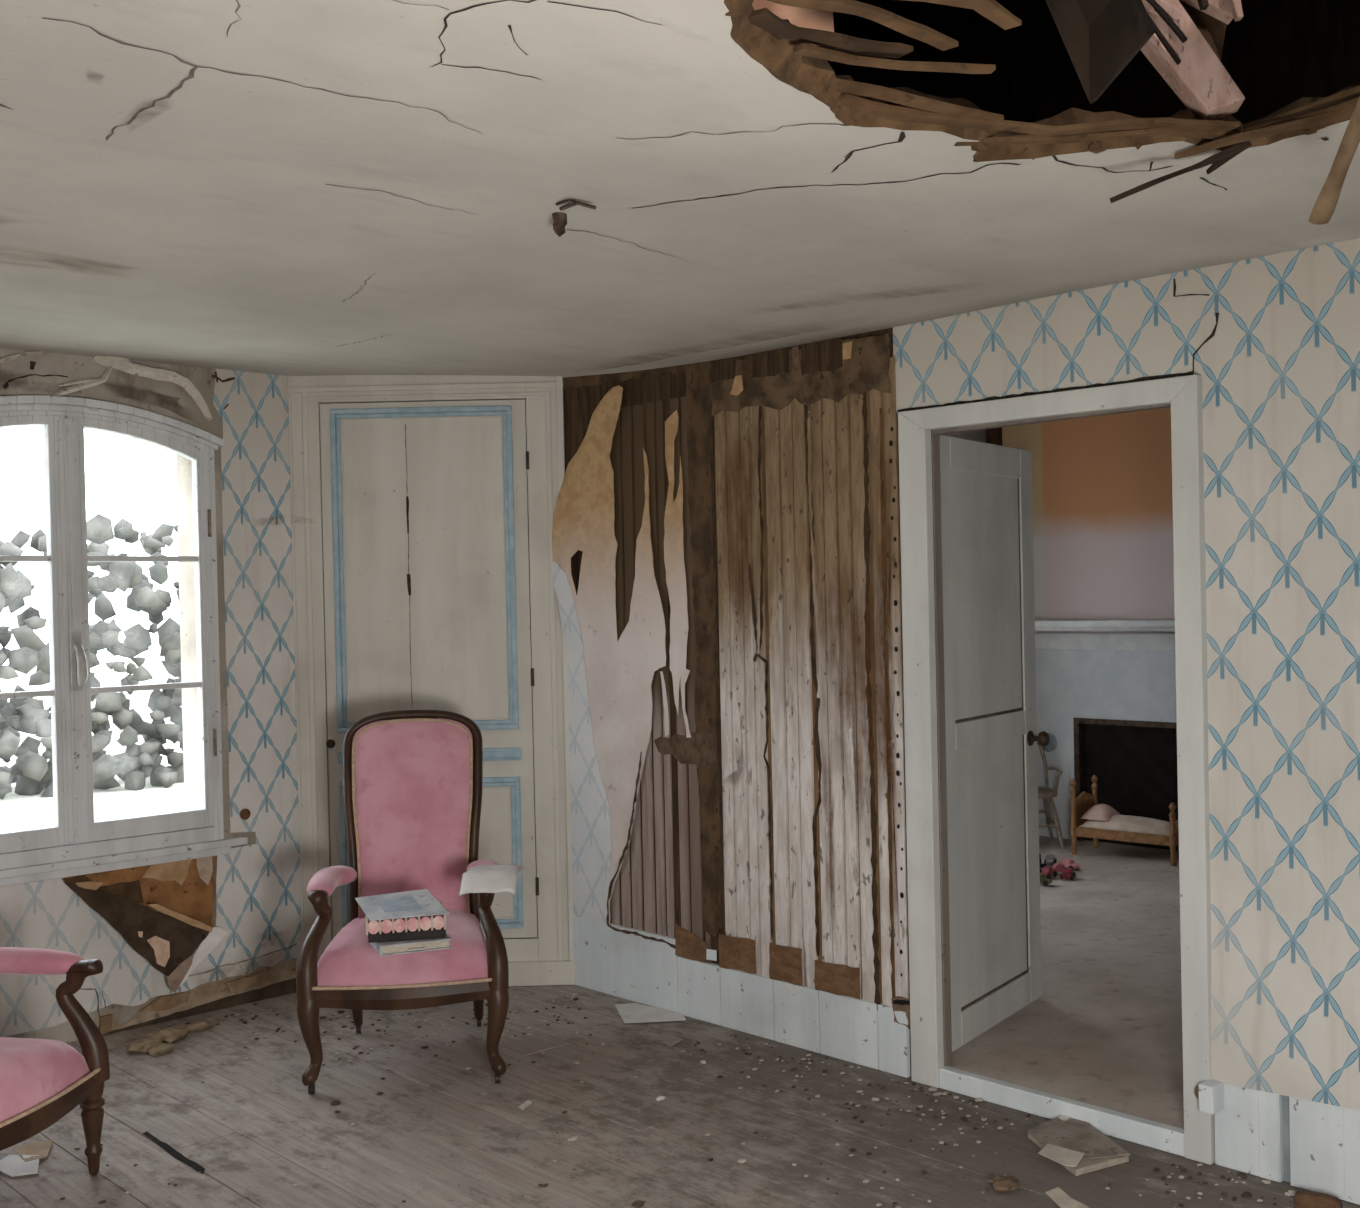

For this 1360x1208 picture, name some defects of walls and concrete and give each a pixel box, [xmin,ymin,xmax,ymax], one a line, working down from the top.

crack [42,18,482,140]
crack [393,0,661,80]
spalling [724,0,1360,162]
peeling [50,356,213,421]
crack [898,278,1219,412]
peeling [807,411,822,698]
peeling [849,729,860,962]